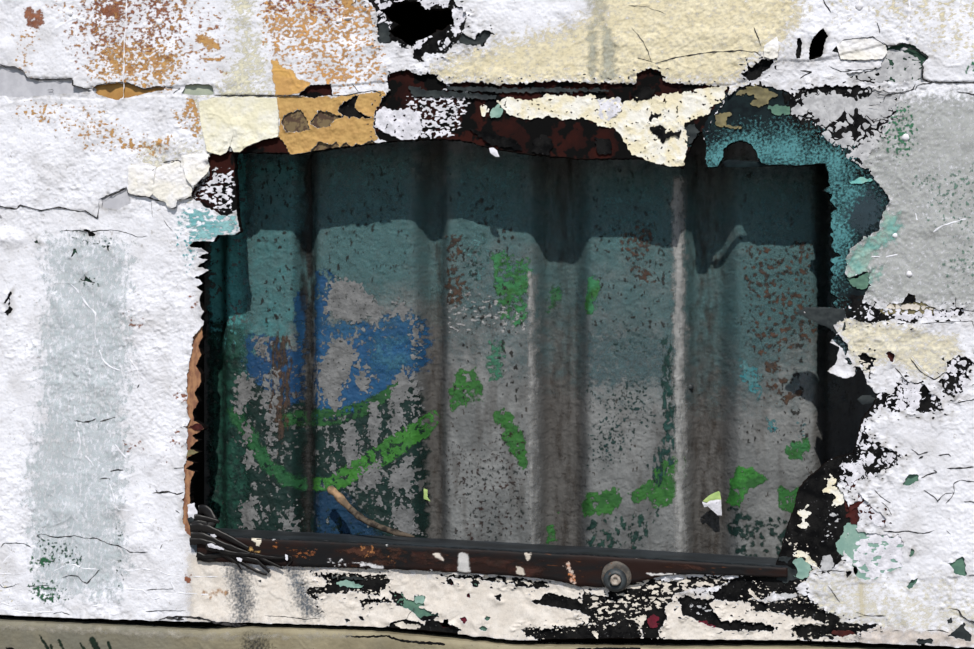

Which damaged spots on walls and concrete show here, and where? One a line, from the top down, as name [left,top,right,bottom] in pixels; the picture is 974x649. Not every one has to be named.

crack [0,64,180,93]
corrosion [11,0,229,93]
crack [214,91,303,99]
crack [800,23,974,122]
crack [0,174,210,237]
peeling [102,0,971,474]
peeling [315,160,430,535]
peeling [181,326,204,536]
peeling [234,493,303,532]
corrosion [345,546,455,571]
corrosion [469,557,544,577]
peeling [436,328,974,649]